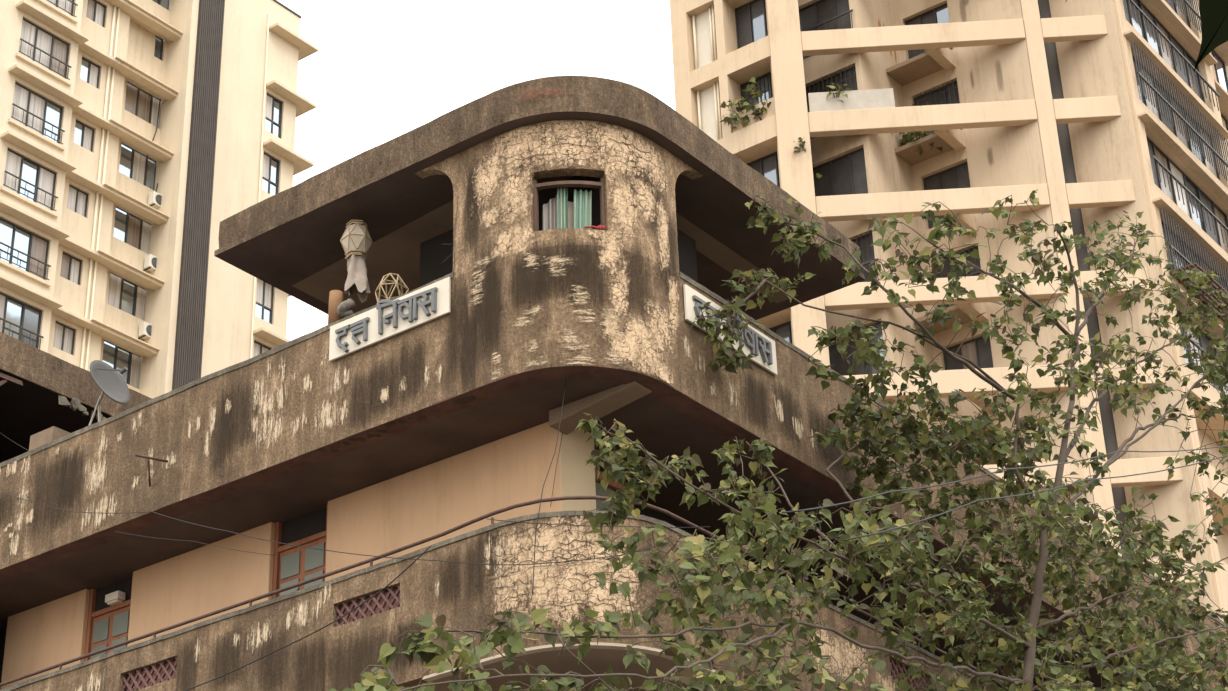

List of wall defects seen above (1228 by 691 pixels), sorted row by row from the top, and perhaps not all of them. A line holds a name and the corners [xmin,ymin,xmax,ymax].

damp [465,165,485,248]
crack [441,131,659,327]
damp [623,158,677,313]
damp [449,240,606,385]
peeling [188,399,232,457]
peeling [250,349,427,453]
damp [34,455,82,526]
damp [443,532,498,598]
crack [480,518,683,622]
damp [176,646,196,691]
damp [213,634,241,684]
damp [261,623,426,691]